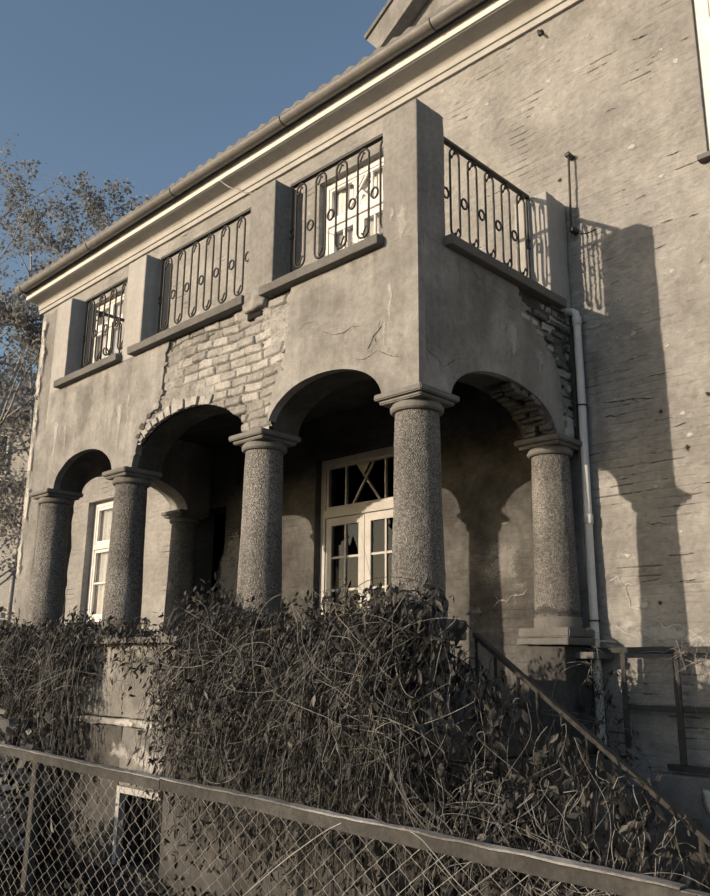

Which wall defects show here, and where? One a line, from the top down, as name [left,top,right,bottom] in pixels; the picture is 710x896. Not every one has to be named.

spalling [135,294,290,445]
crack [298,316,399,360]
spalling [519,288,576,439]
spalling [701,789,710,818]